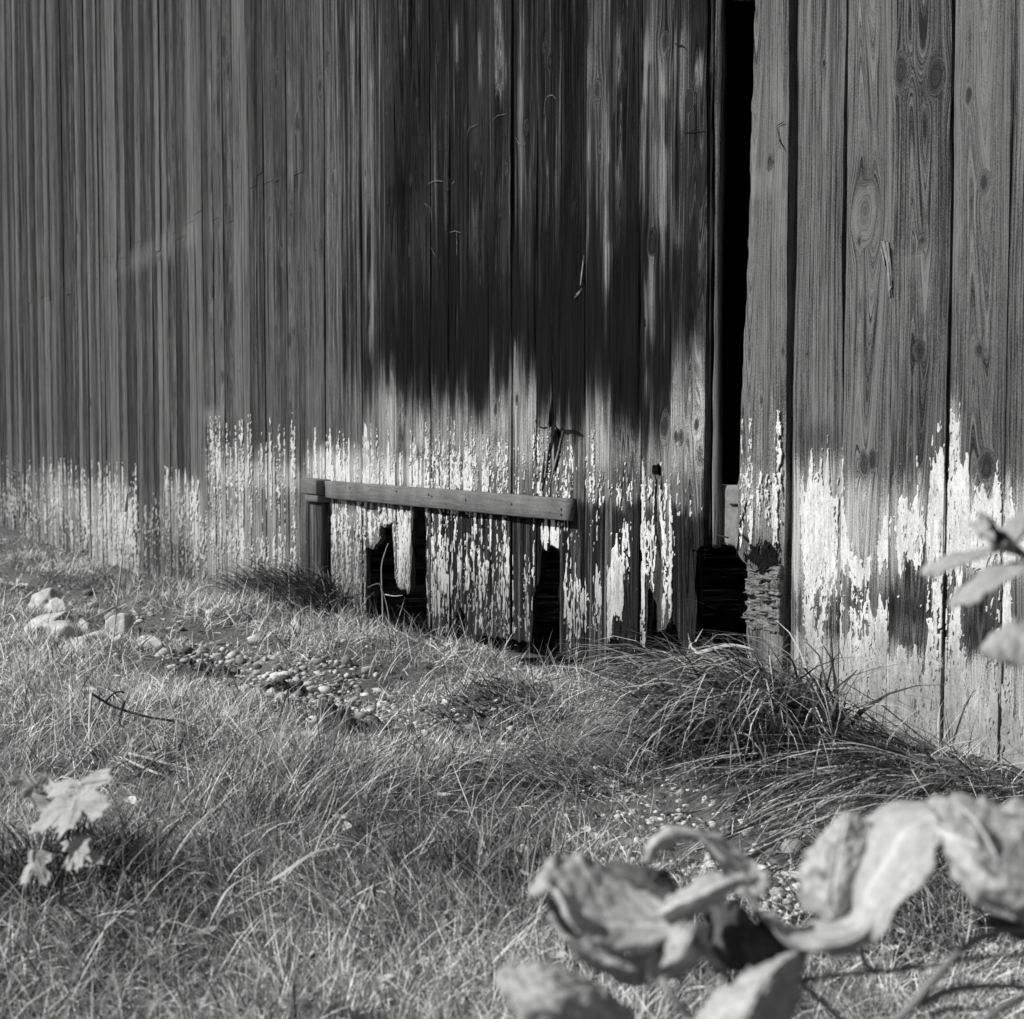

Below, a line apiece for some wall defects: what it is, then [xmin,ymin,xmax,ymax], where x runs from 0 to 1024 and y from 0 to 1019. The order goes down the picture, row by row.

peeling [0,412,703,659]
peeling [741,566,776,620]
peeling [739,410,783,550]
peeling [800,403,1024,769]